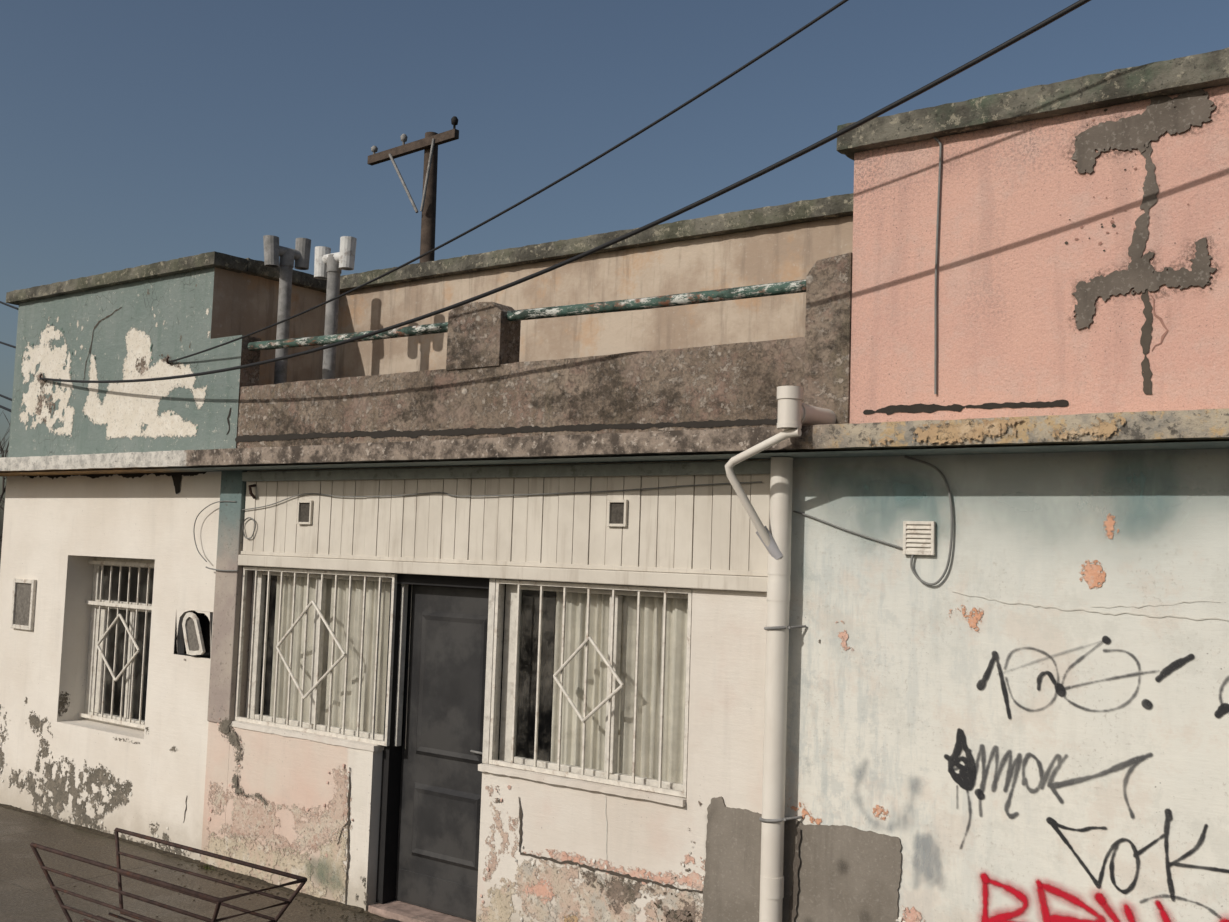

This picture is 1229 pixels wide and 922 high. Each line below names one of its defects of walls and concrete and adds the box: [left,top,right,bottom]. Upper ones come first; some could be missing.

crack [1060,88,1221,395]
peeling [19,289,207,440]
peeling [949,605,983,633]
peeling [1078,560,1106,589]
flaking render [0,691,367,905]
flaking render [476,785,705,922]
peeling [896,906,925,922]